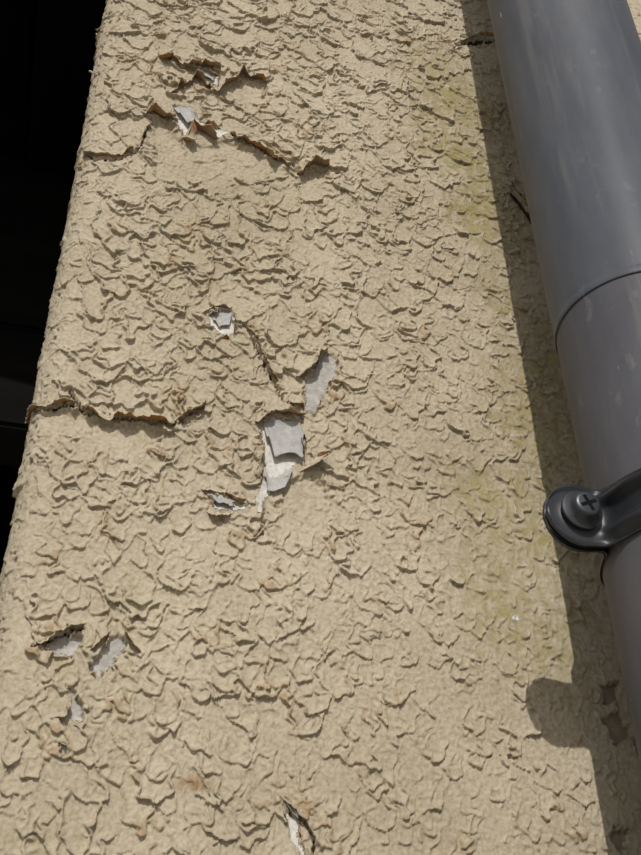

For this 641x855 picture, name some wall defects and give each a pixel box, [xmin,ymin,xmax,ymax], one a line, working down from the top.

peeling [158,51,267,93]
peeling [145,102,292,164]
peeling [202,303,238,340]
peeling [201,345,338,529]
peeling [36,622,142,679]
peeling [55,689,83,729]
crack [280,796,316,855]